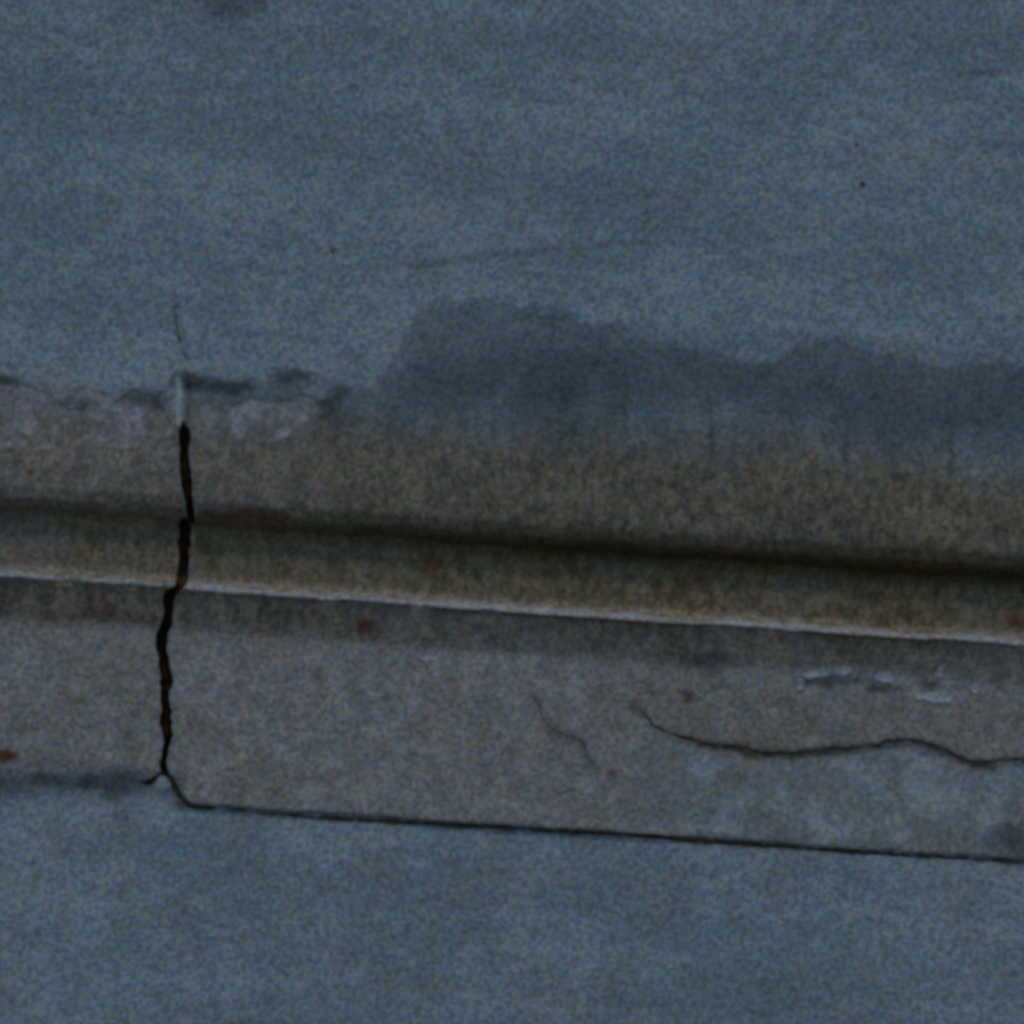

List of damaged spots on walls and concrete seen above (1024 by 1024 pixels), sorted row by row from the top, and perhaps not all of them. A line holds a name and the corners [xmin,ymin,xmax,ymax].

water stain [413,357,623,425]
crack [142,292,1024,863]